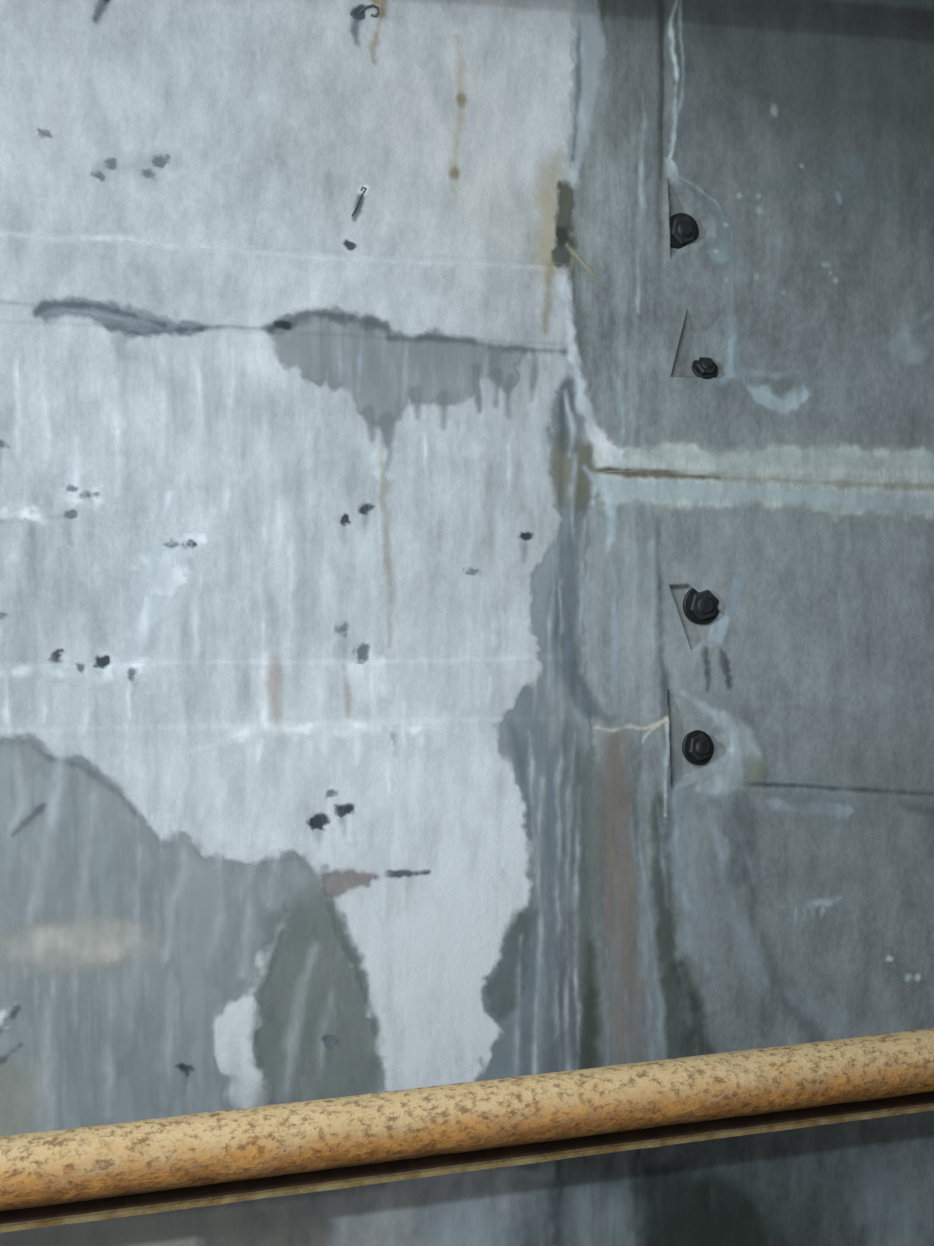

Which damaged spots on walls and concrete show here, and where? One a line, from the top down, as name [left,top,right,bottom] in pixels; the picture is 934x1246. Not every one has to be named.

water stain [34,298,204,336]
water stain [13,359,22,456]
water stain [267,308,536,483]
water stain [59,411,123,509]
water stain [0,506,46,524]
spalling [308,790,353,829]